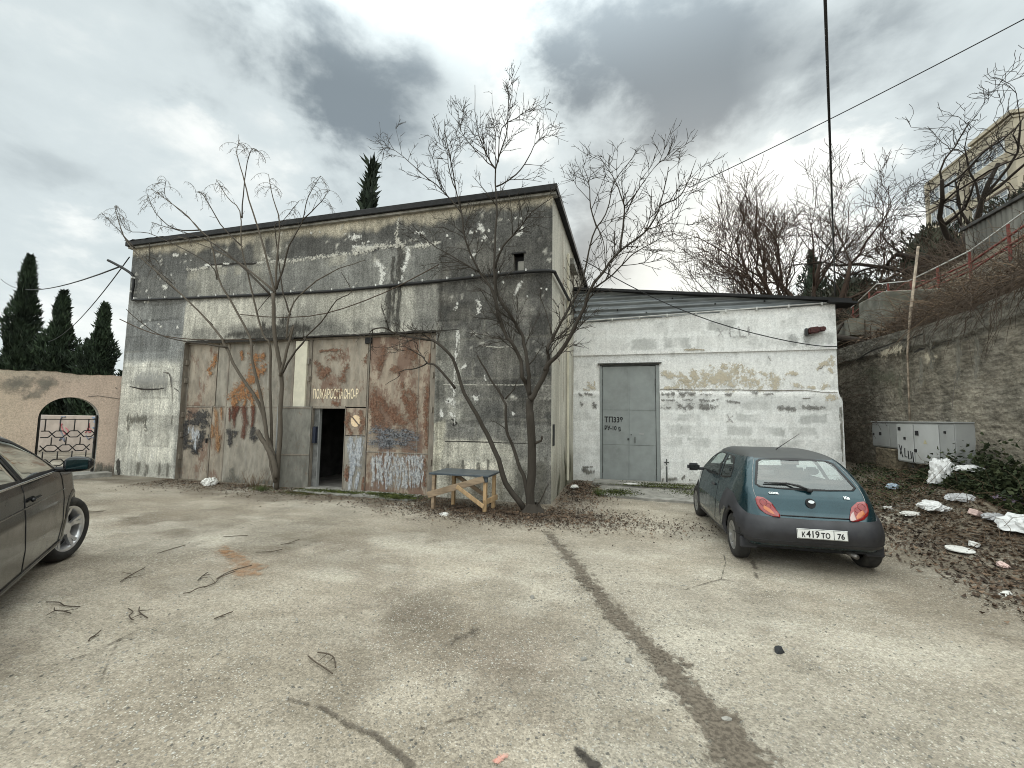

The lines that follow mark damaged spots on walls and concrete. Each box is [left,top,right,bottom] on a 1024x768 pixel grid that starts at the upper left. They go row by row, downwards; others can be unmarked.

water stain [374,242,411,332]
corrosion [211,351,269,452]
corrosion [313,345,431,487]
peeling [660,355,838,401]